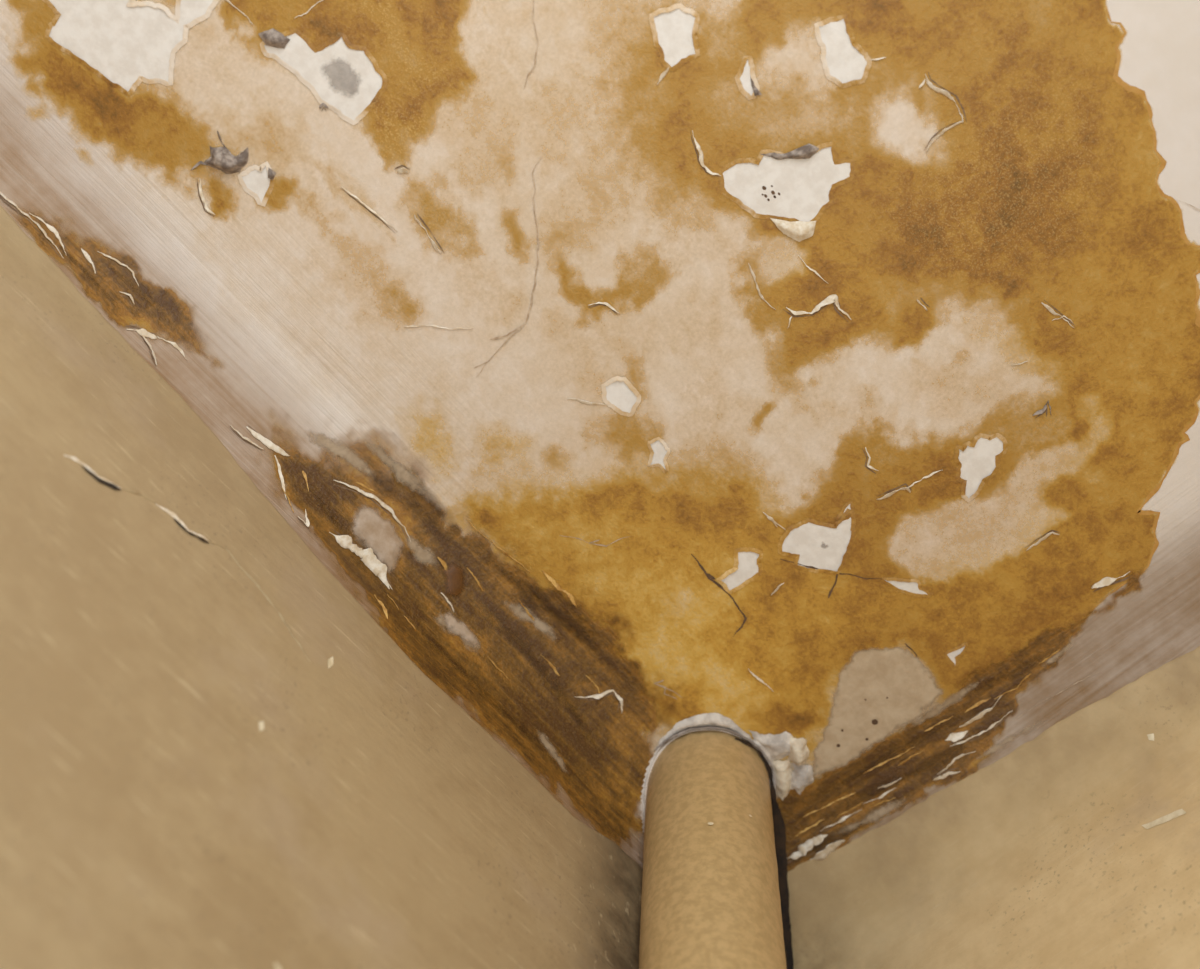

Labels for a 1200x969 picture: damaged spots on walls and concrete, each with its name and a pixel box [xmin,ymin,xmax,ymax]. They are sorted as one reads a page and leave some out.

leakage [8,0,236,219]
peeling [42,0,387,125]
leakage [219,0,515,258]
peeling [649,3,700,85]
peeling [814,14,886,88]
leakage [19,212,217,363]
peeling [690,130,856,327]
leakage [272,0,1200,872]
peeling [877,433,1008,502]
crack [691,554,747,637]
peeling [716,547,763,594]
peeling [763,501,856,575]